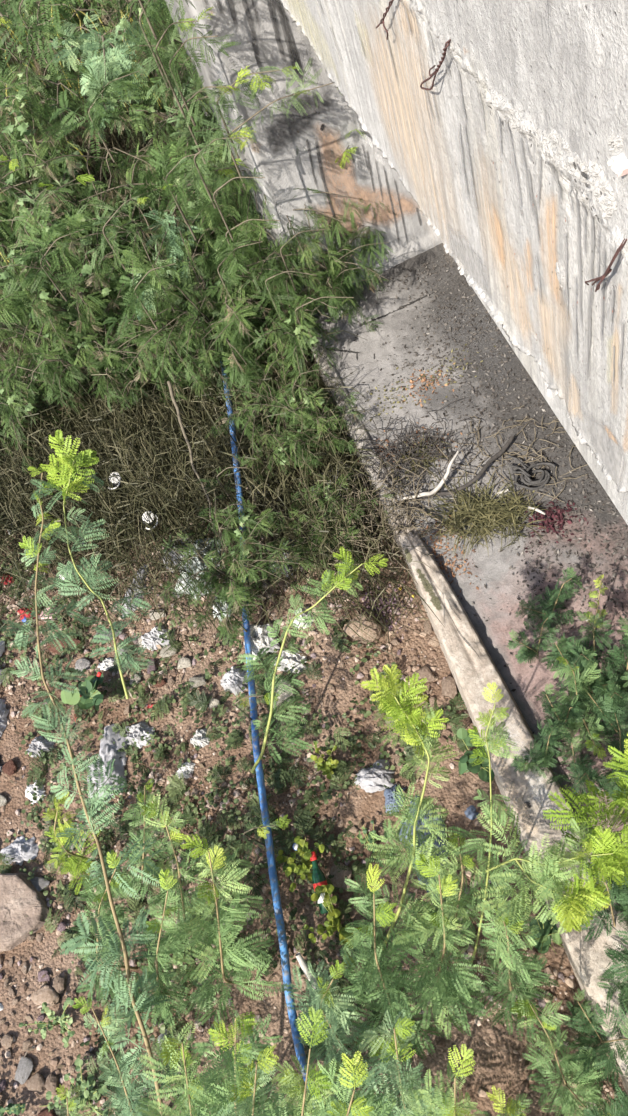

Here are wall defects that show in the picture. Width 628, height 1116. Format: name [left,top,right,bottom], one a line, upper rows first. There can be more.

rust [376,33,445,218]
spalling [552,259,578,306]